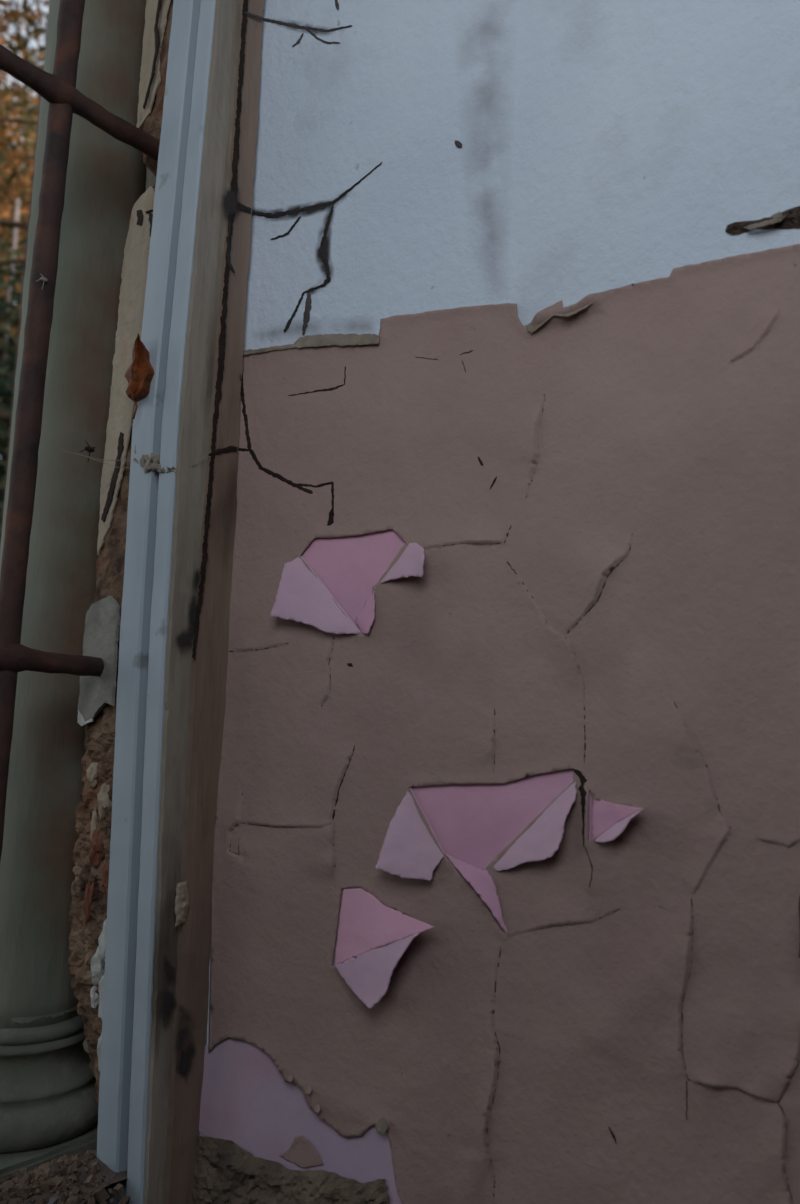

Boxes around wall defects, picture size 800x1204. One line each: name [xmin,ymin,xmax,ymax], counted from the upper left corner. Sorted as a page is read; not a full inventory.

crack [244,0,352,47]
crack [226,162,382,332]
flaking render [725,206,800,235]
crack [288,366,346,396]
crack [208,374,334,526]
crack [423,525,633,762]
peeling [77,711,94,726]
crack [332,745,355,867]
crack [682,1051,700,1120]
crack [740,1063,799,1203]